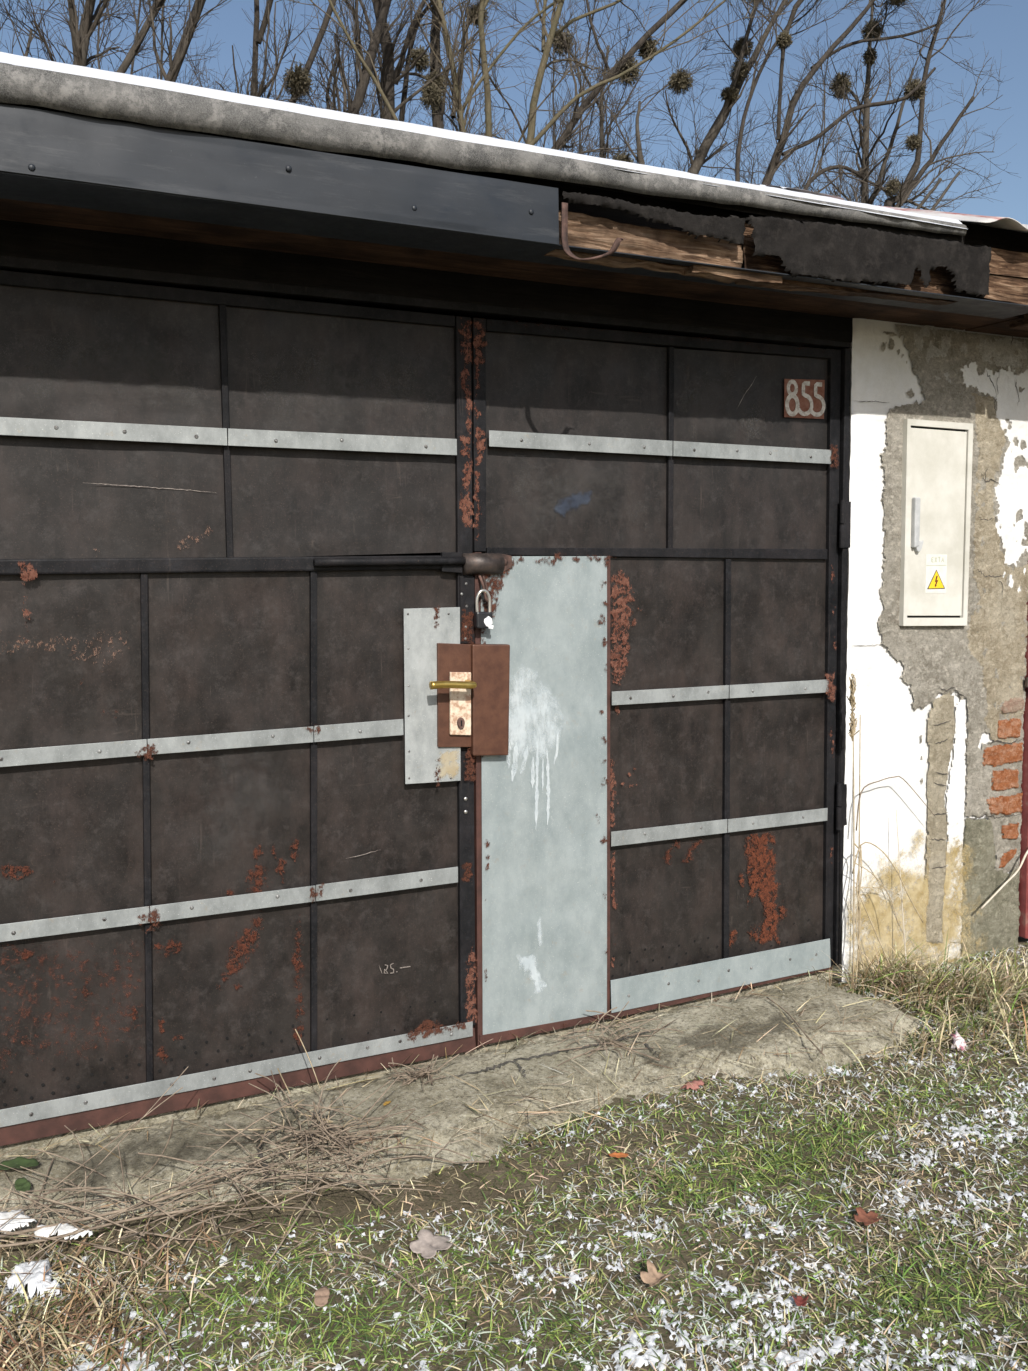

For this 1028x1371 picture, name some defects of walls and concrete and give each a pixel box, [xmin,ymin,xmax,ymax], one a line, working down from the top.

corrosion [458,317,487,538]
corrosion [461,553,641,685]
flaking render [877,324,1028,958]
corrosion [136,744,158,761]
corrosion [227,839,299,896]
corrosion [729,833,786,947]
water stain [846,830,981,980]
corrosion [406,945,487,1041]